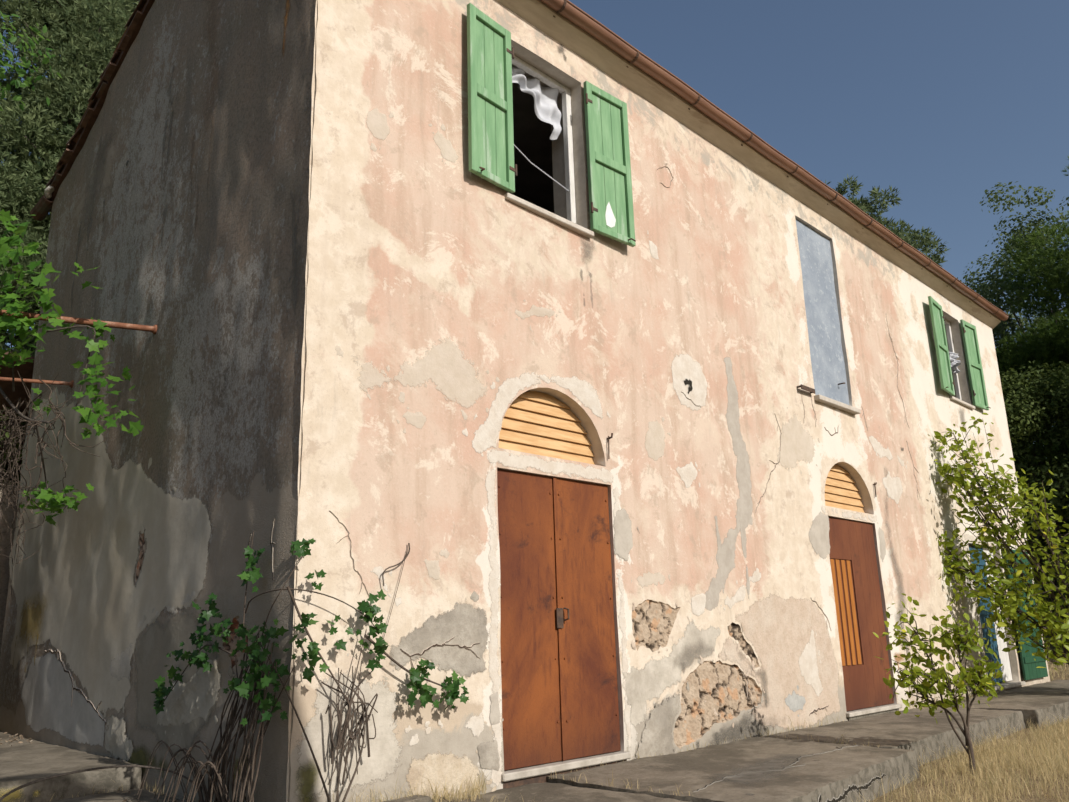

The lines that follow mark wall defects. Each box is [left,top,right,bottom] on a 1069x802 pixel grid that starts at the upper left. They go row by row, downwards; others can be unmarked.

spalling [135,524,146,585]
crack [44,649,106,723]
spalling [631,593,706,659]
peeling [673,568,841,749]
crack [692,745,860,792]
crack [818,774,886,802]